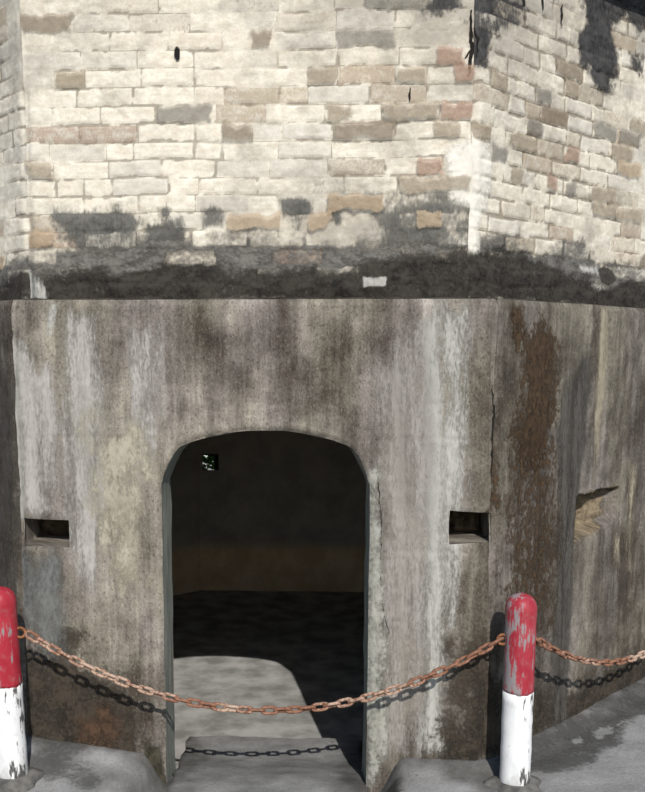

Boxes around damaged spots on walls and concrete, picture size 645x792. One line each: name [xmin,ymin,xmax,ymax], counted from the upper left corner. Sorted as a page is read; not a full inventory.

crack [465,10,480,65]
crack [523,0,563,26]
damp [578,0,645,94]
damp [51,204,186,256]
damp [203,207,223,226]
damp [281,198,312,230]
damp [490,304,645,772]